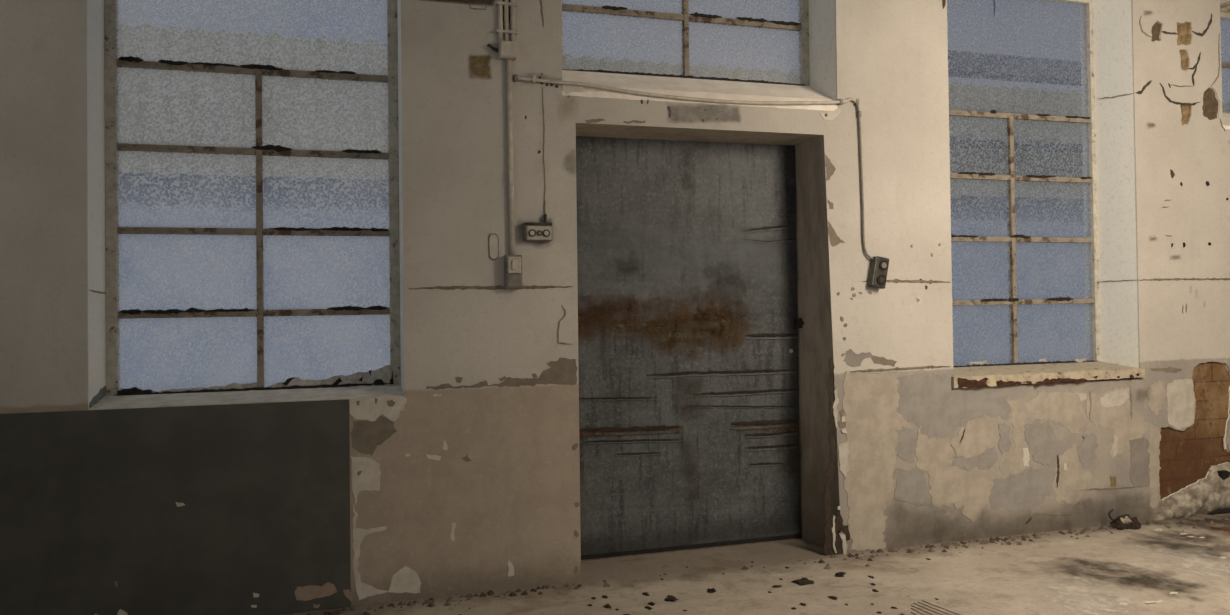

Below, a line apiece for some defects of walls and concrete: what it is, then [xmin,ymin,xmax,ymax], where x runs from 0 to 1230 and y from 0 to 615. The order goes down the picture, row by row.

flaking render [1151,22,1161,42]
flaking render [1177,22,1192,71]
flaking render [1180,87,1219,125]
crack [1100,276,1230,284]
peeling [426,358,577,397]
rust [958,376,1098,388]
peeling [823,316,1230,556]
peeling [295,396,421,608]